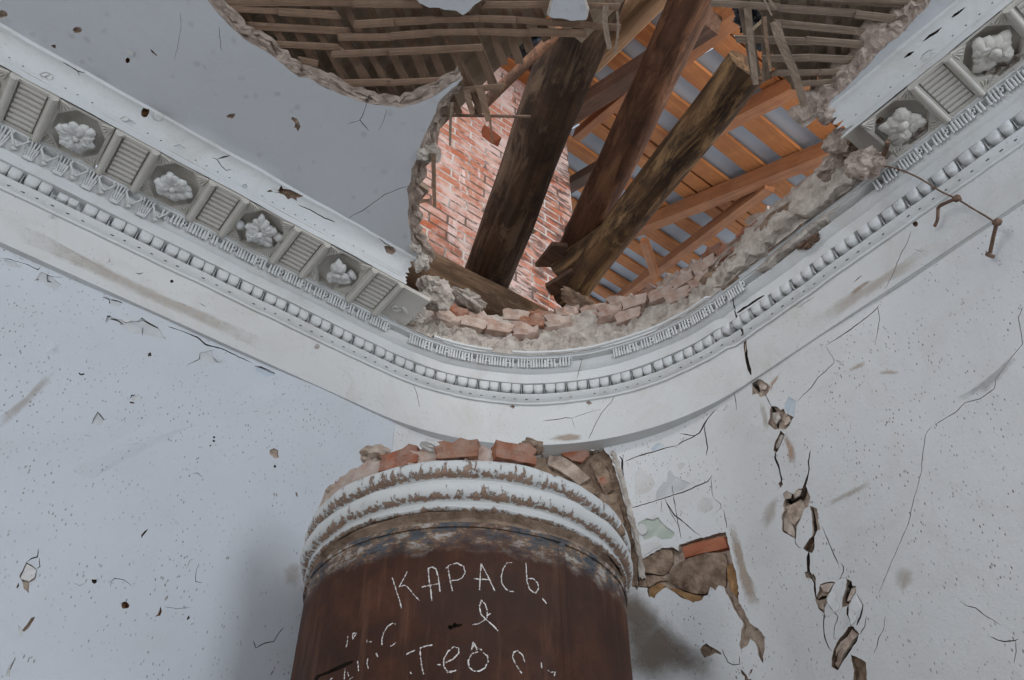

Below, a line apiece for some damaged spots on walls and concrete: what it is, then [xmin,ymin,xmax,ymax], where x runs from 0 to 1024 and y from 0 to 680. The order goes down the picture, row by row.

flaking render [208,0,463,263]
flaking render [16,551,40,593]
crack [170,327,253,364]
flaking render [534,449,765,680]
crack [620,232,1023,680]